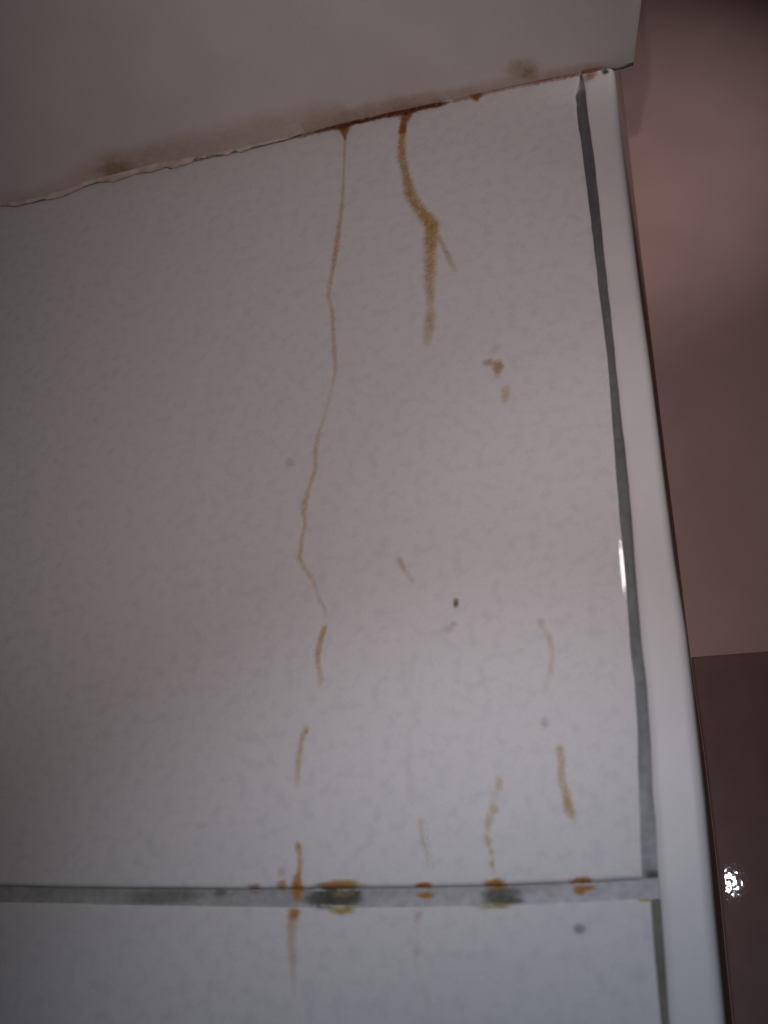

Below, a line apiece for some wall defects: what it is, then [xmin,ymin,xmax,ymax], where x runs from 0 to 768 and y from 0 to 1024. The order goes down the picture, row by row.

corrosion [399,111,438,296]
corrosion [279,872,303,919]
corrosion [416,883,433,898]
corrosion [572,877,594,894]